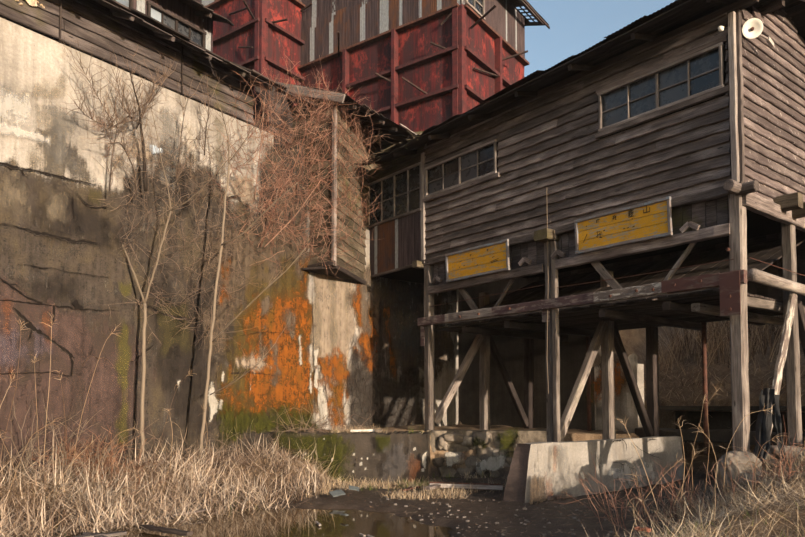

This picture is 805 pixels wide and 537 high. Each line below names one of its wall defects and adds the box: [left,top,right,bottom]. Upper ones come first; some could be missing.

crack [0,162,108,216]
crack [0,223,100,244]
damp [0,109,425,475]
crack [0,277,75,376]
damp [434,290,460,381]
peeling [208,372,224,422]
damp [445,452,459,467]